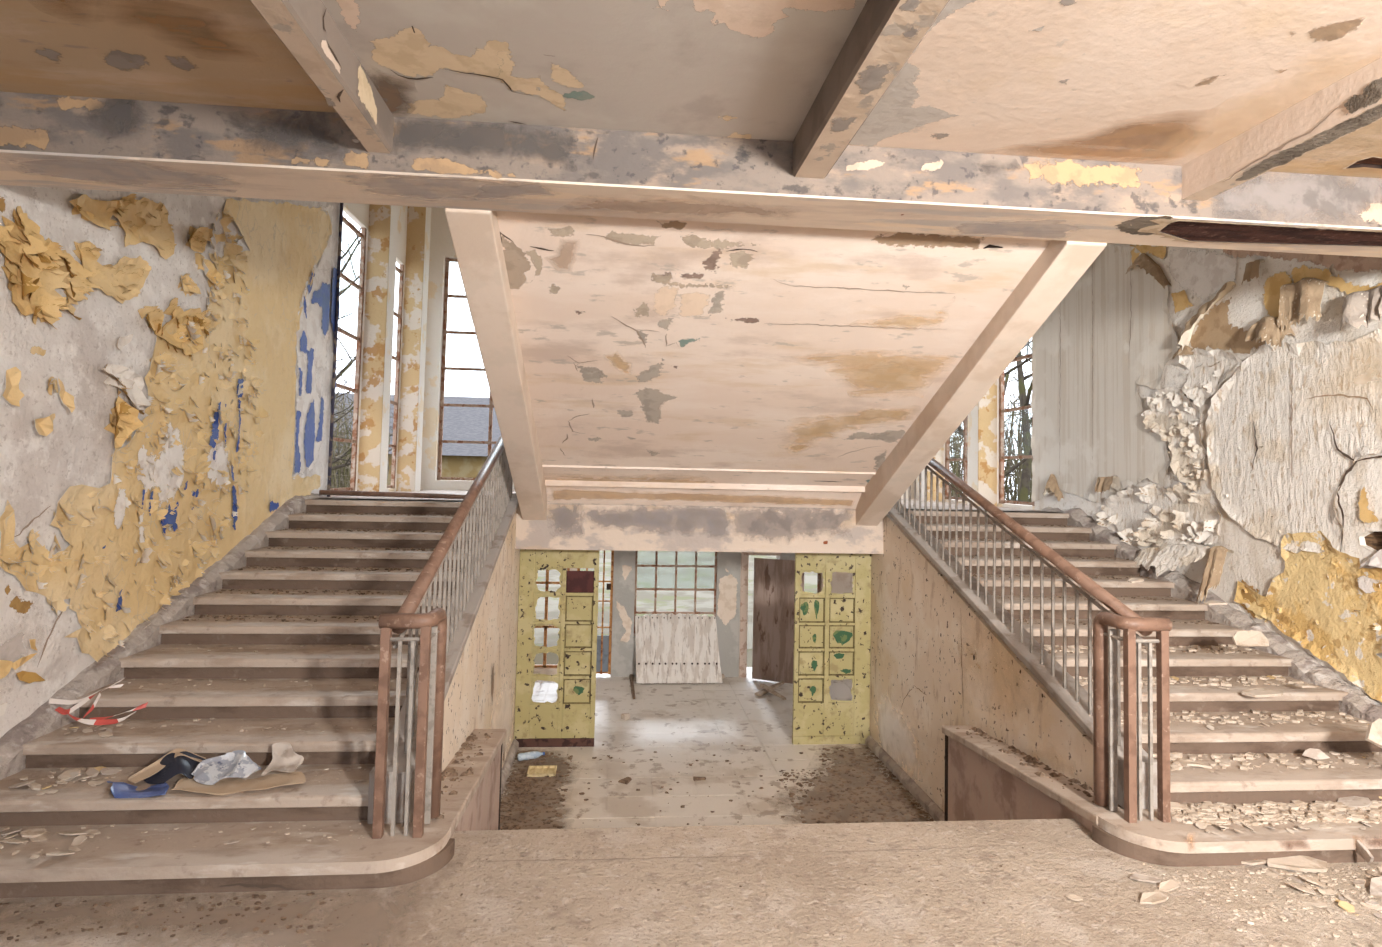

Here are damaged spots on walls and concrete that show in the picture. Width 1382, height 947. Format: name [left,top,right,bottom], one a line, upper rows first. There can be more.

peeling [693,0,856,38]
peeling [1290,18,1363,41]
peeling [321,40,341,74]
peeling [358,28,594,124]
peeling [831,0,976,171]
water stain [1032,121,1195,159]
peeling [291,150,549,198]
peeling [0,125,340,662]
peeling [1024,78,1382,766]
crack [1250,421,1258,473]
crack [1290,358,1382,552]
spalling [1279,748,1344,773]